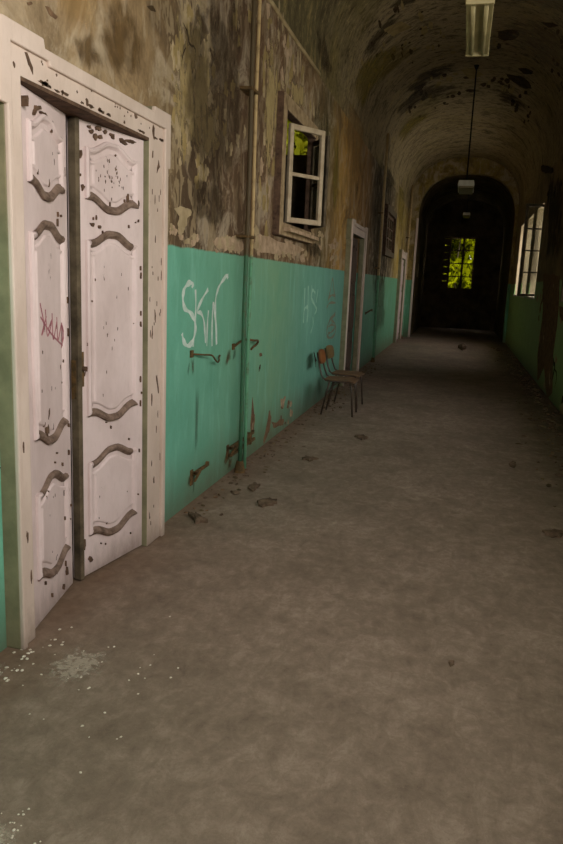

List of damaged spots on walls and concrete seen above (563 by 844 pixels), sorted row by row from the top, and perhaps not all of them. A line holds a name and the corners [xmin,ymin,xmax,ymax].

spalling [21,95,47,115]
spalling [39,74,138,124]
peeling [170,0,213,185]
damp [398,65,456,140]
spalling [86,125,136,145]
peeling [29,169,65,202]
peeling [80,154,140,251]
peeling [34,212,65,245]
peeling [536,273,563,397]